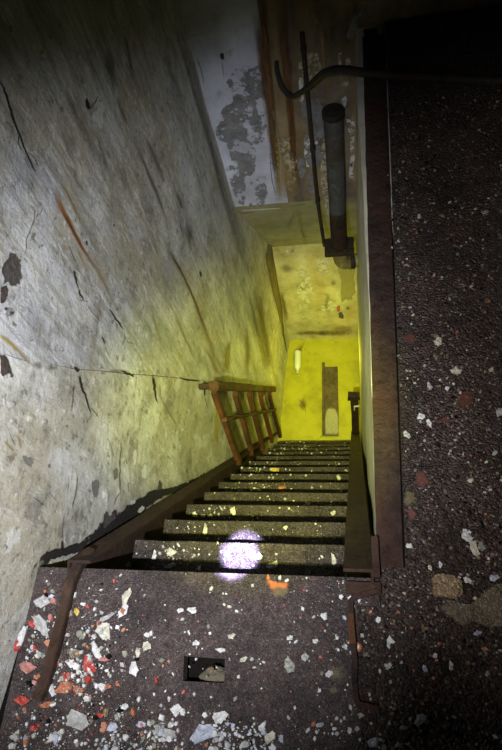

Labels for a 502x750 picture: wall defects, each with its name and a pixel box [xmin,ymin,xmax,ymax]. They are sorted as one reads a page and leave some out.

crack [1,84,38,170]
peeling [215,52,329,216]
corrosion [257,12,298,188]
corrosion [56,190,89,271]
flaking render [0,253,22,316]
flaking render [0,355,13,378]
crack [62,247,207,419]